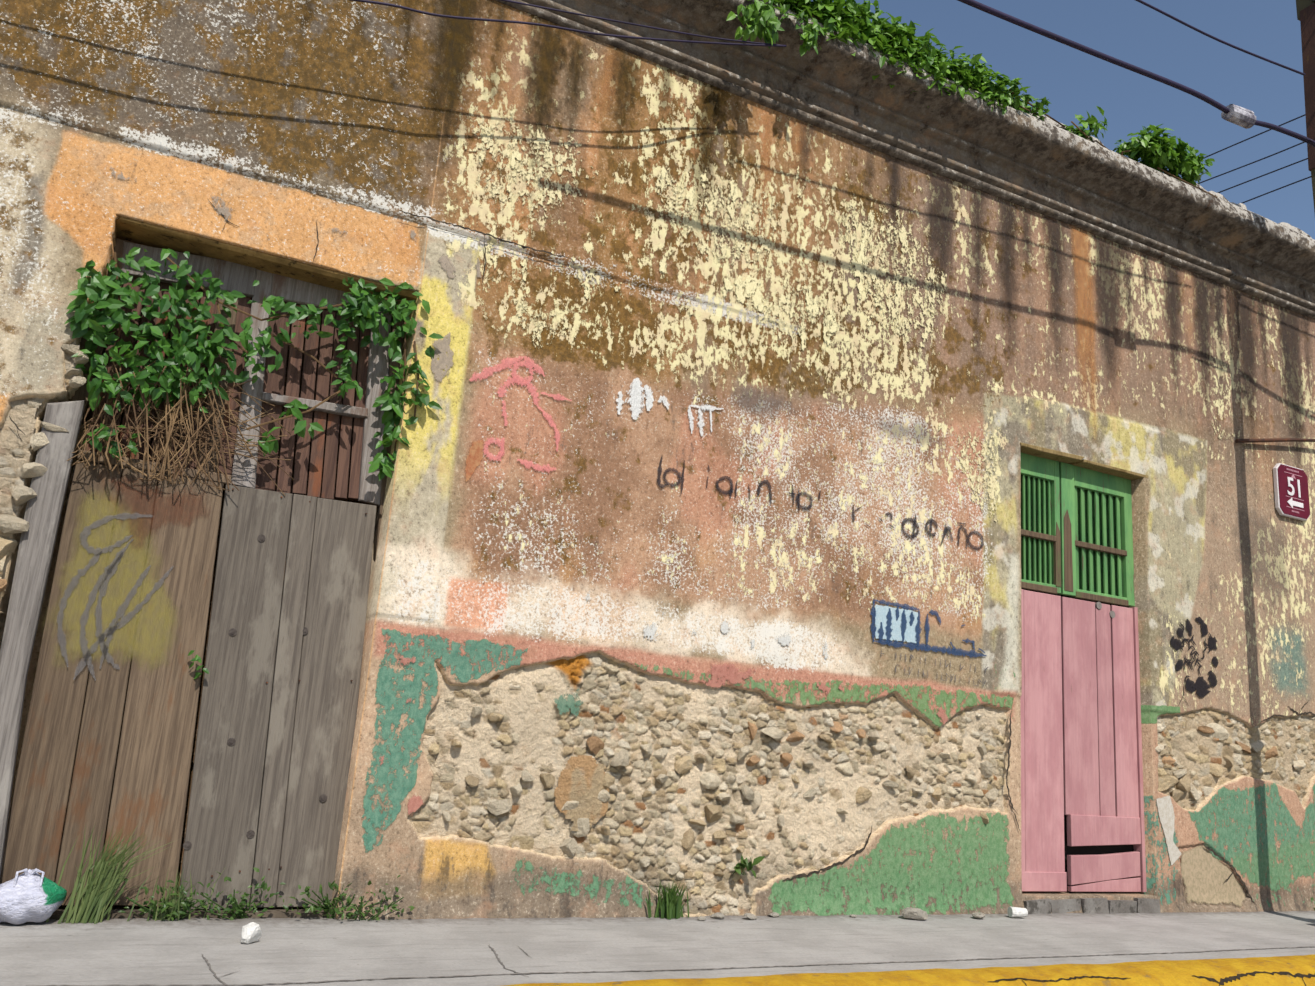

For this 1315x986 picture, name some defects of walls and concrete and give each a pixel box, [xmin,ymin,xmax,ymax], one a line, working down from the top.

peeling [655,164,839,361]
peeling [837,200,952,367]
leakage [929,175,954,279]
leakage [1001,203,1030,324]
leakage [1095,237,1147,370]
leakage [1165,265,1308,455]
flaking render [0,397,69,592]
flaking render [407,652,1007,920]
crack [783,827,872,881]
flaking render [1155,709,1315,906]
crack [987,976,1131,986]
crack [1192,971,1315,986]